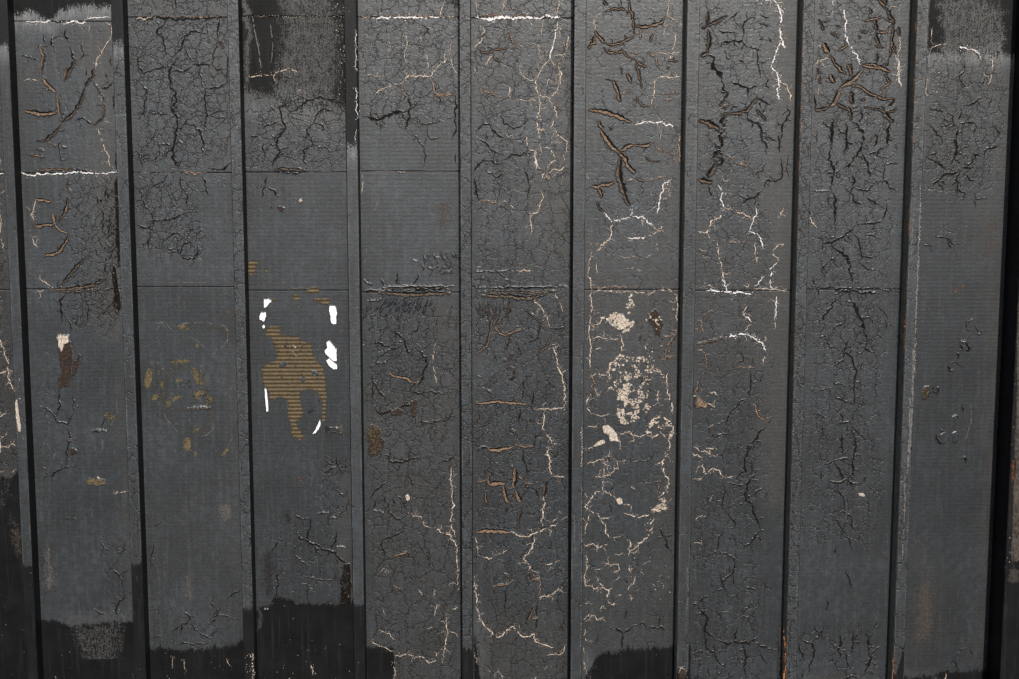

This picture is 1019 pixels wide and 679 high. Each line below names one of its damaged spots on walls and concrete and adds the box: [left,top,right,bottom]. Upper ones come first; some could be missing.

crack [22,0,569,260]
crack [924,30,1000,207]
crack [0,340,16,472]
peeling [56,334,81,389]
peeling [258,298,343,440]
peeling [286,286,338,325]
crack [152,0,880,679]
crack [812,105,899,587]